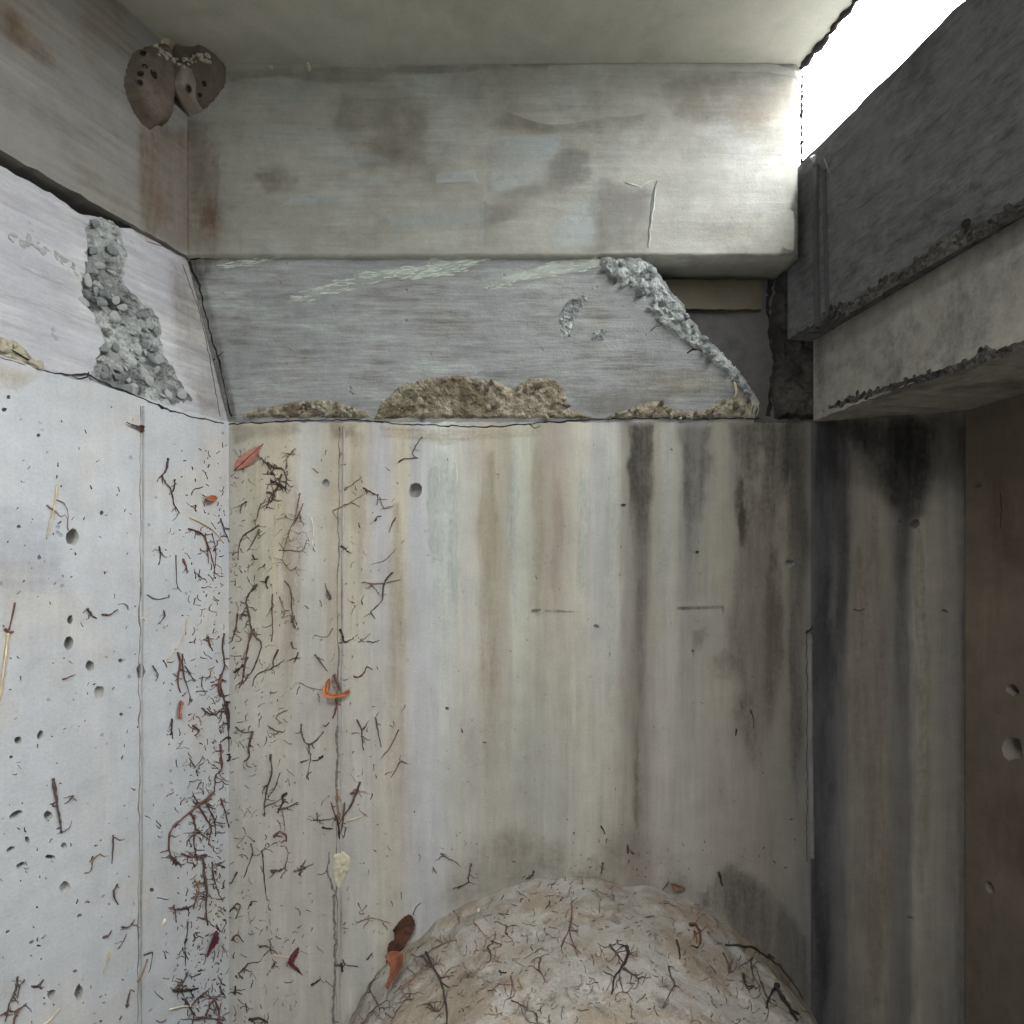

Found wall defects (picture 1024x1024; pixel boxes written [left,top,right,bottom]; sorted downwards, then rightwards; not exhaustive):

spalling [8,217,193,406]
peeling [557,295,588,337]
spalling [597,180,756,420]
spalling [810,199,1024,332]
spalling [823,340,1024,412]
water stain [629,425,652,499]